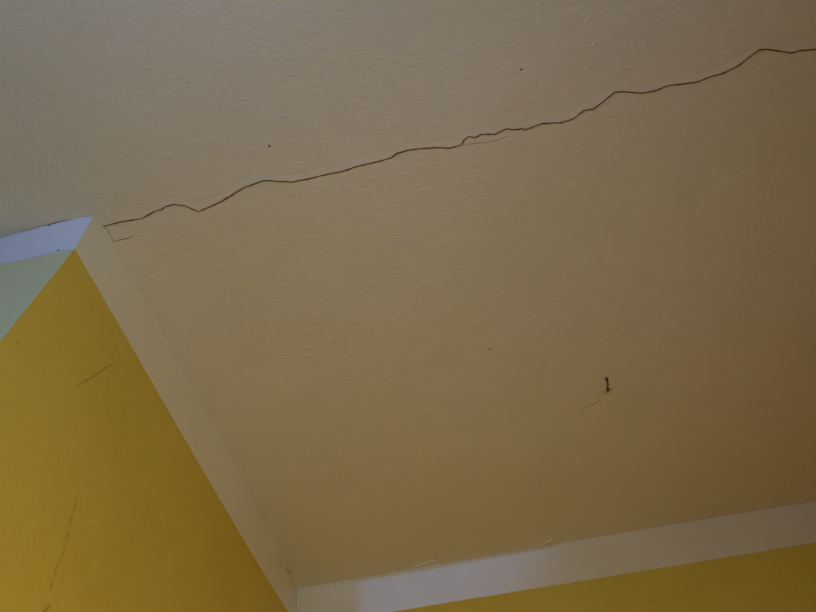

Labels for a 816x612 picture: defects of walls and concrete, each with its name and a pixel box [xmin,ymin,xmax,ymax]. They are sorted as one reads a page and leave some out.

crack [102,42,816,241]